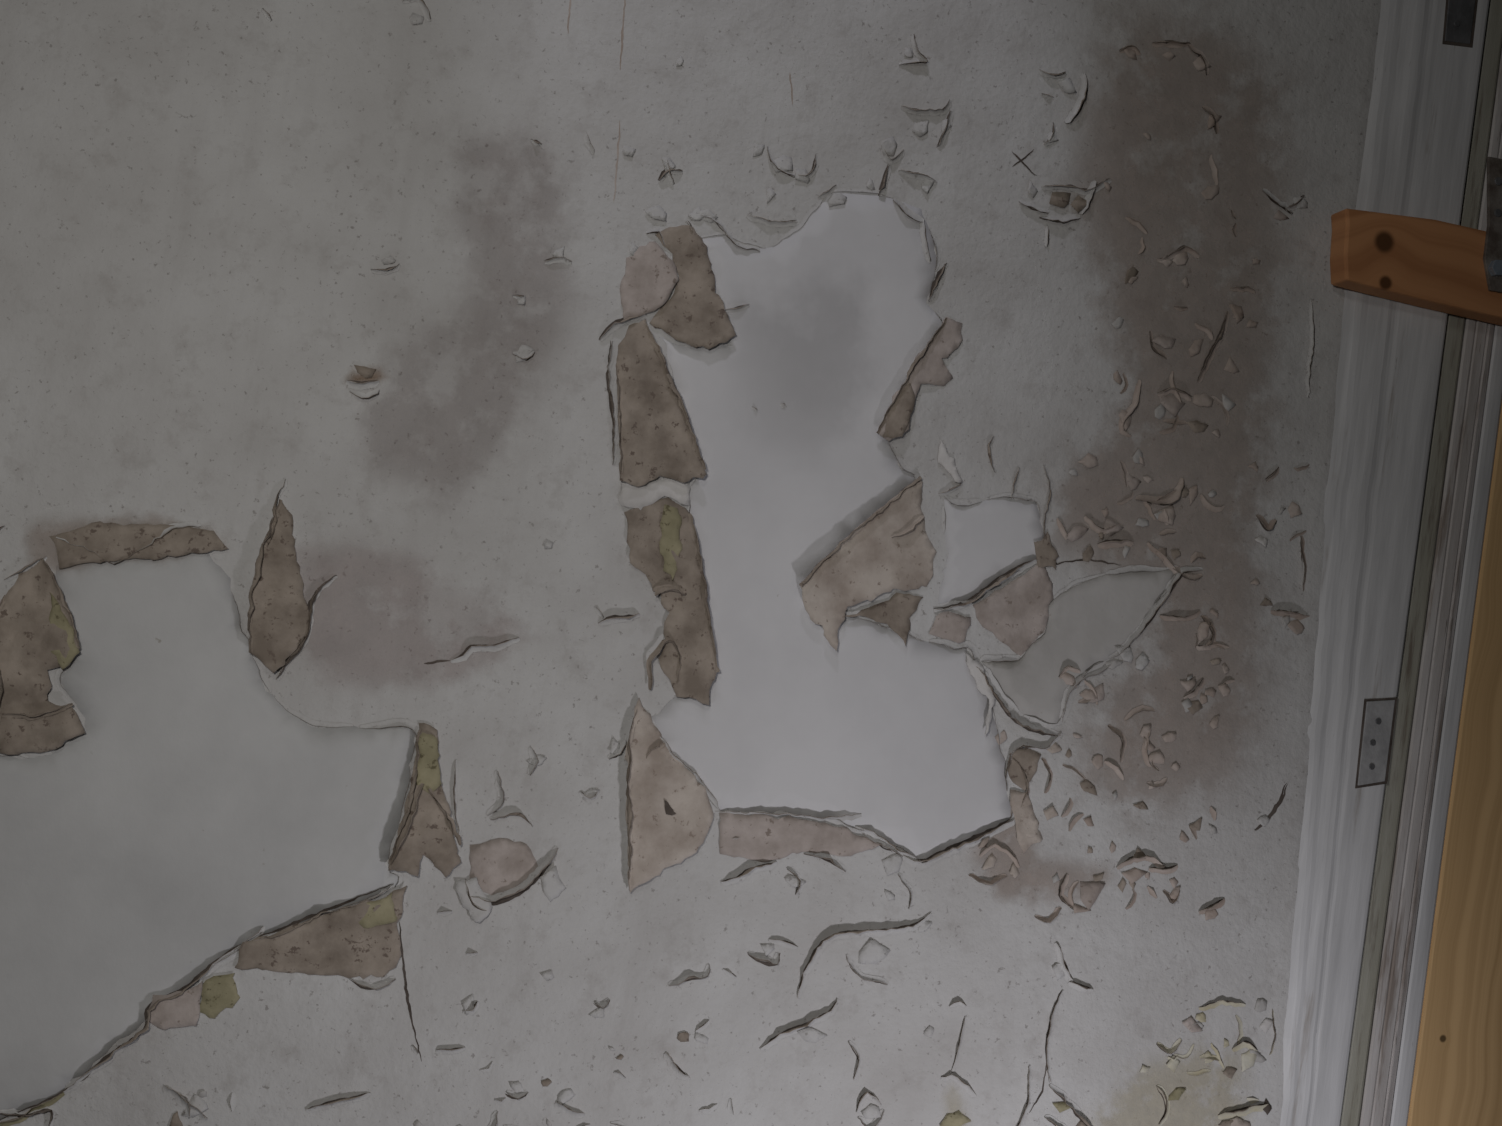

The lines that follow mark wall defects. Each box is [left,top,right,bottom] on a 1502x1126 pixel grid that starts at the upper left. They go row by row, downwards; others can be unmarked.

peeling [1119,40,1211,75]
peeling [901,100,954,148]
peeling [1012,69,1112,247]
peeling [608,136,1235,999]
peeling [0,479,566,1126]
peeling [589,998,610,1017]
peeling [664,1020,710,1081]
crack [924,1001,968,1073]
crack [1029,942,1094,1126]
crack [305,1093,372,1113]
peeling [488,1078,590,1126]